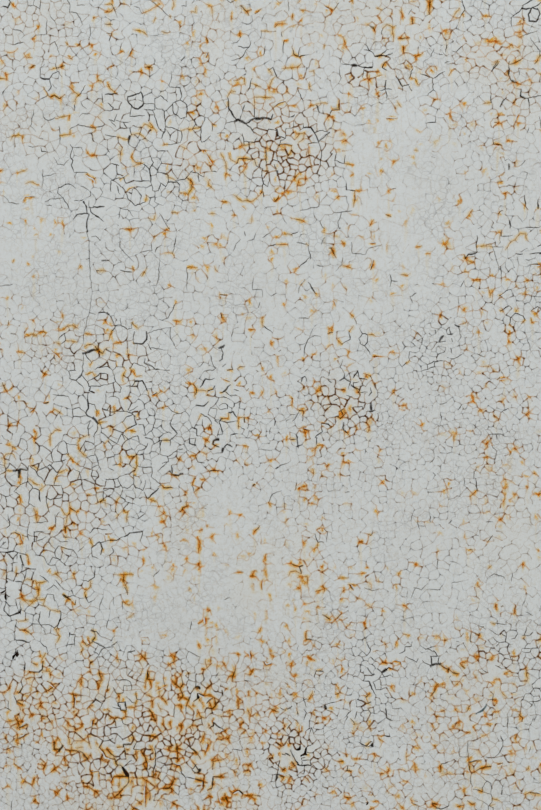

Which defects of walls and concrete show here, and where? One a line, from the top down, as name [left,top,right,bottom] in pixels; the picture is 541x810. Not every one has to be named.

crack [513,0,541,22]
crack [14,20,541,291]
crack [485,221,541,359]
crack [2,312,541,810]